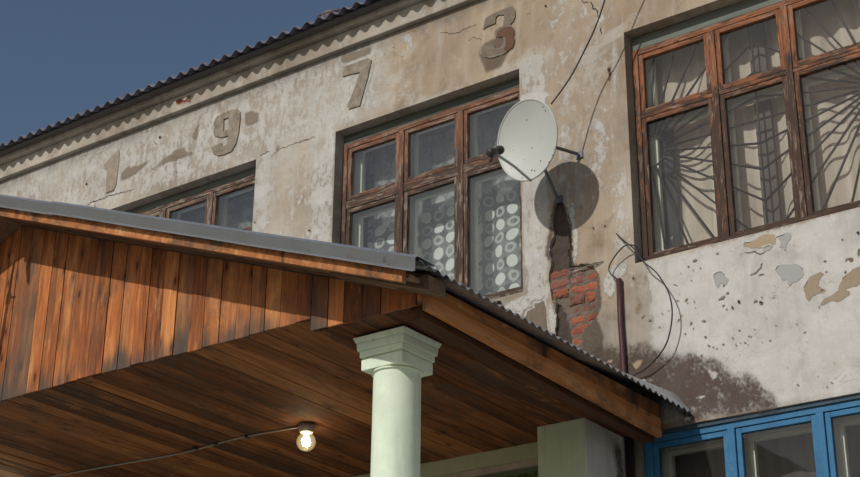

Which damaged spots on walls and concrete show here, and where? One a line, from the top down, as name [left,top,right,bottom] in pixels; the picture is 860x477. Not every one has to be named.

crack [440,24,482,41]
crack [87,188,135,206]
peeling [743,233,791,252]
spalling [489,202,628,348]
peeling [775,249,860,308]
leakage [581,275,777,420]